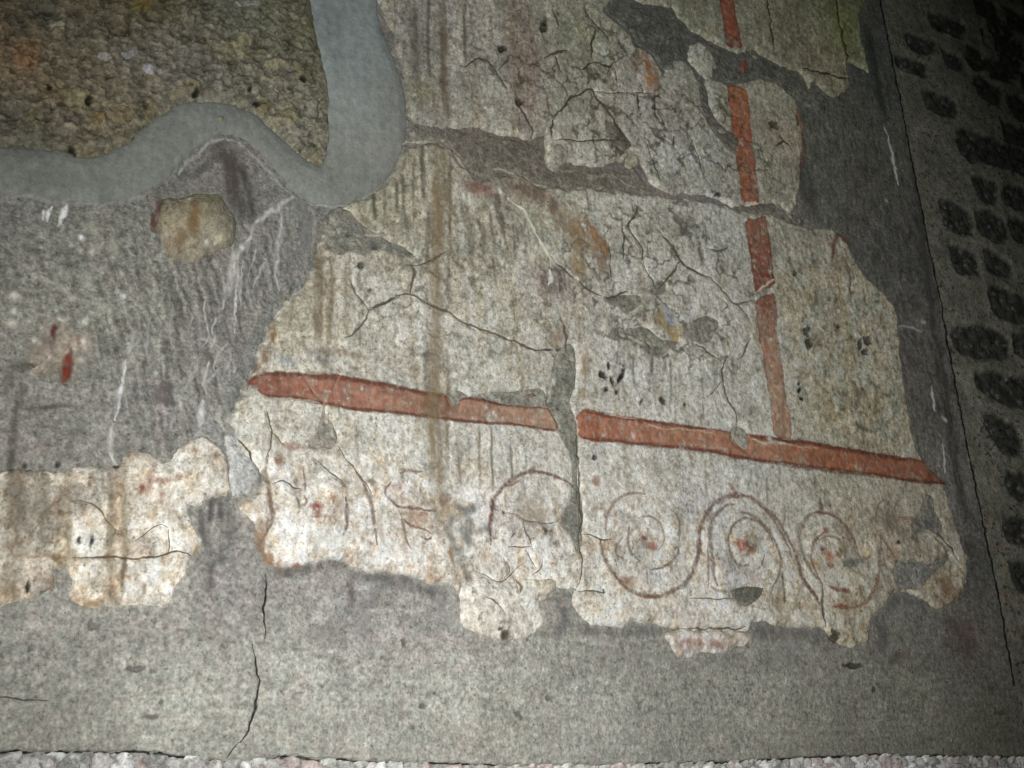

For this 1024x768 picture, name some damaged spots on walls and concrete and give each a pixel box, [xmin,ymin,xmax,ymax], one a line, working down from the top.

spalling [0,0,329,166]
spalling [606,6,829,111]
water stain [159,128,481,478]
spalling [321,207,413,256]
crack [345,251,568,351]
crack [551,205,755,428]
spalling [624,316,718,357]
crack [880,0,1015,686]
spalling [310,412,337,448]
crack [0,575,267,761]
crack [476,433,611,616]
spalling [732,586,763,606]